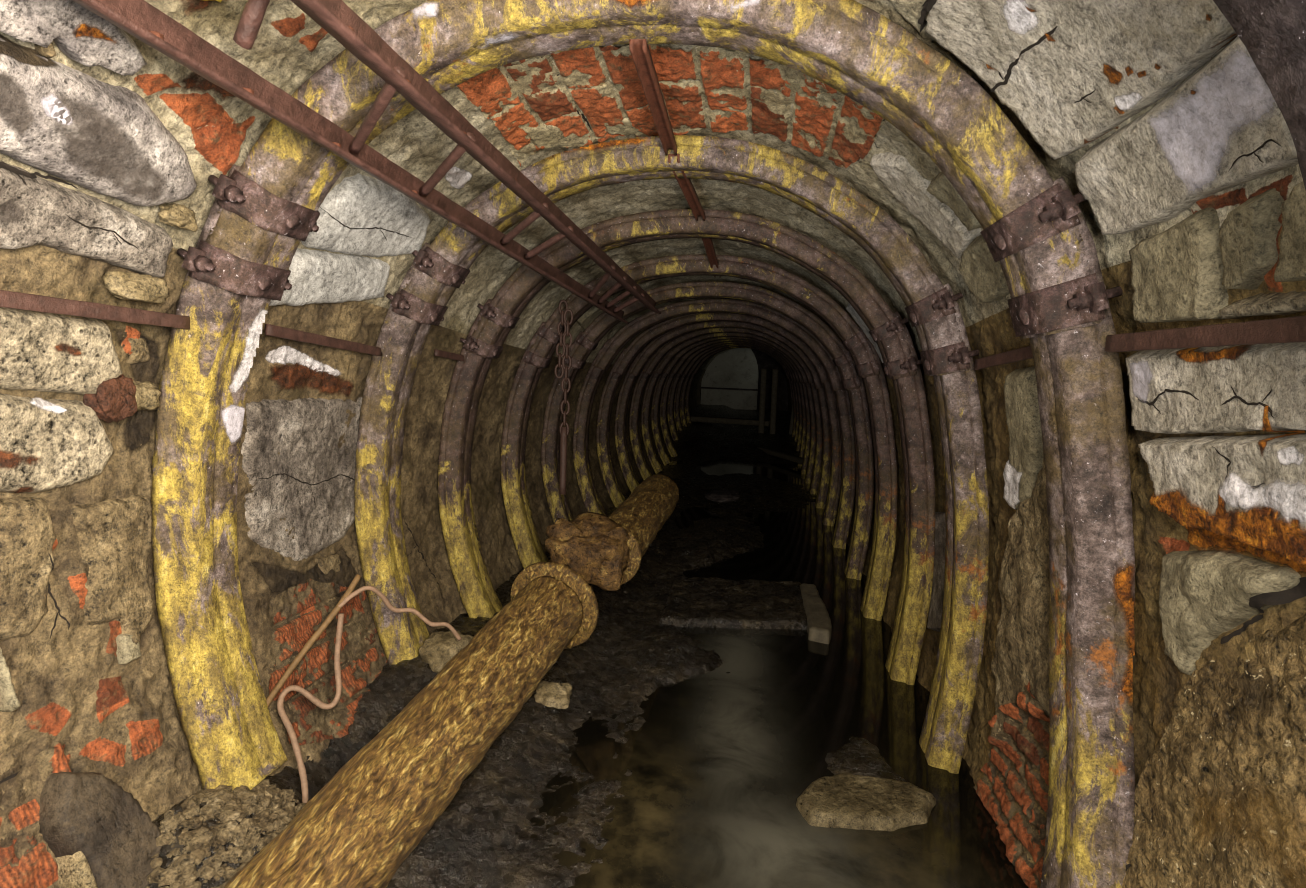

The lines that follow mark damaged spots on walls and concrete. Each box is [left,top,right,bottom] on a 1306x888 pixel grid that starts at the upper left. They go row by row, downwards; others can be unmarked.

crack [990,26,1058,93]
flaking render [456,44,886,169]
efflorescence [1151,53,1273,189]
crack [0,160,140,251]
crack [1136,385,1274,418]
corrosion [0,451,39,468]
corrosion [1149,490,1306,573]
efflorescence [1219,474,1306,522]
efflorescence [1278,447,1303,464]
corrosion [1114,565,1135,700]
flaking render [973,681,1050,888]
flaking render [0,822,98,888]